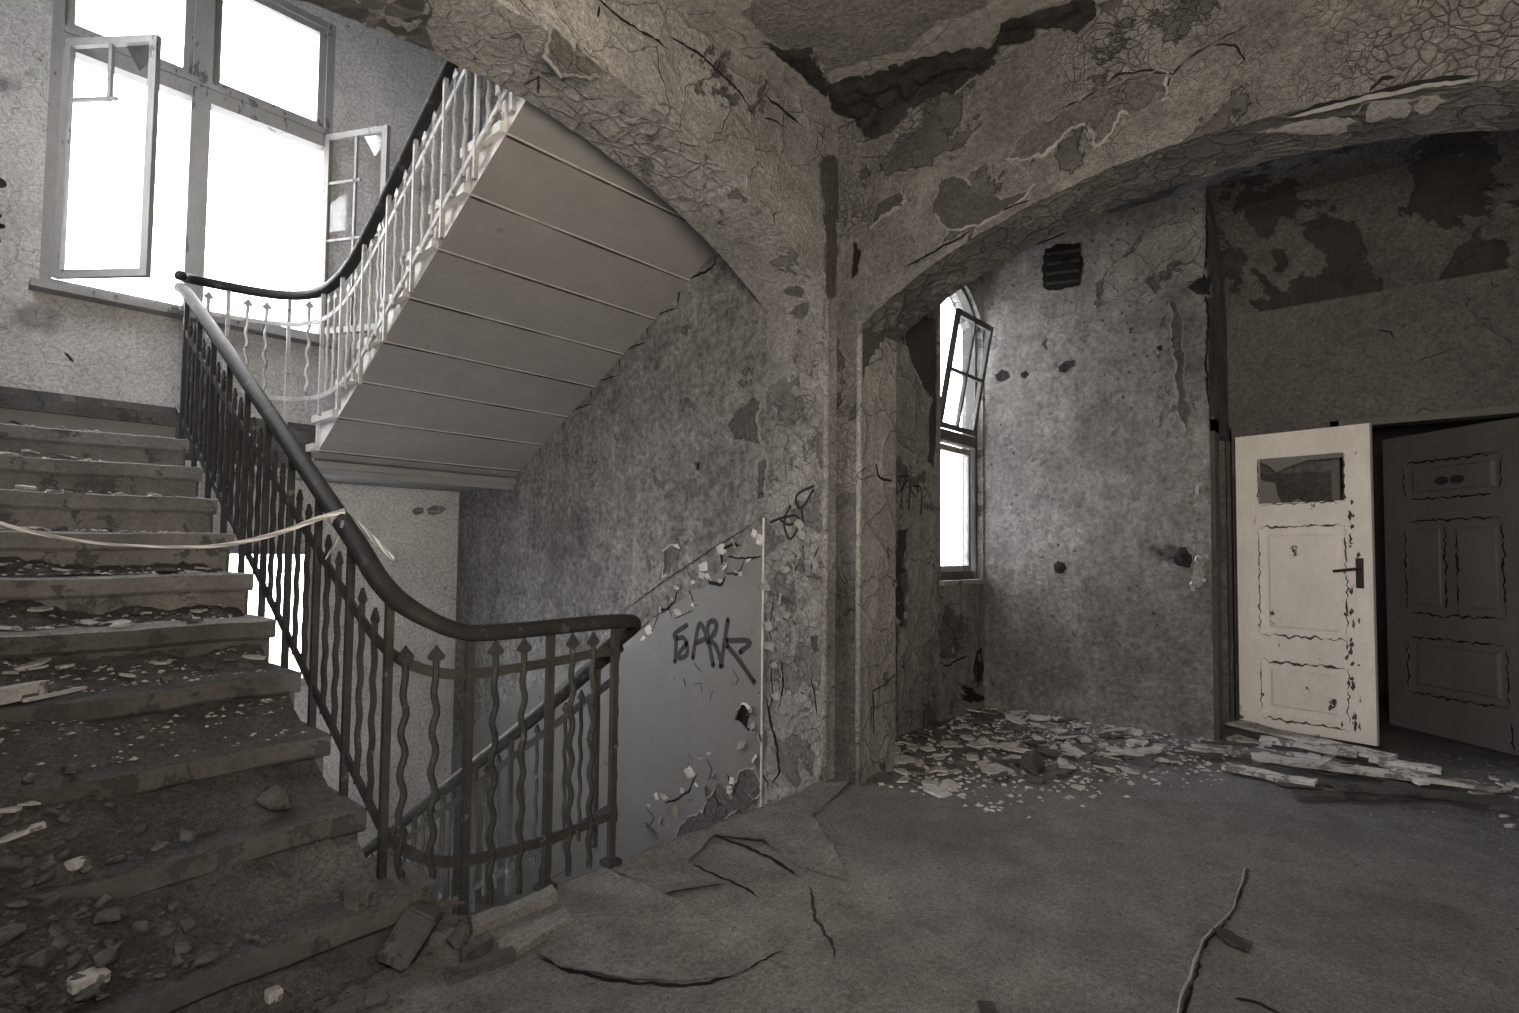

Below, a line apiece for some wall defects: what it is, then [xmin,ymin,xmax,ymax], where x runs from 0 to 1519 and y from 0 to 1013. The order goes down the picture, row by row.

flaking render [297,0,436,52]
crack [523,75,655,141]
crack [577,0,800,128]
spalling [740,0,1128,140]
flaking render [640,529,765,641]
flaking render [759,519,821,669]
flaking render [645,681,780,839]